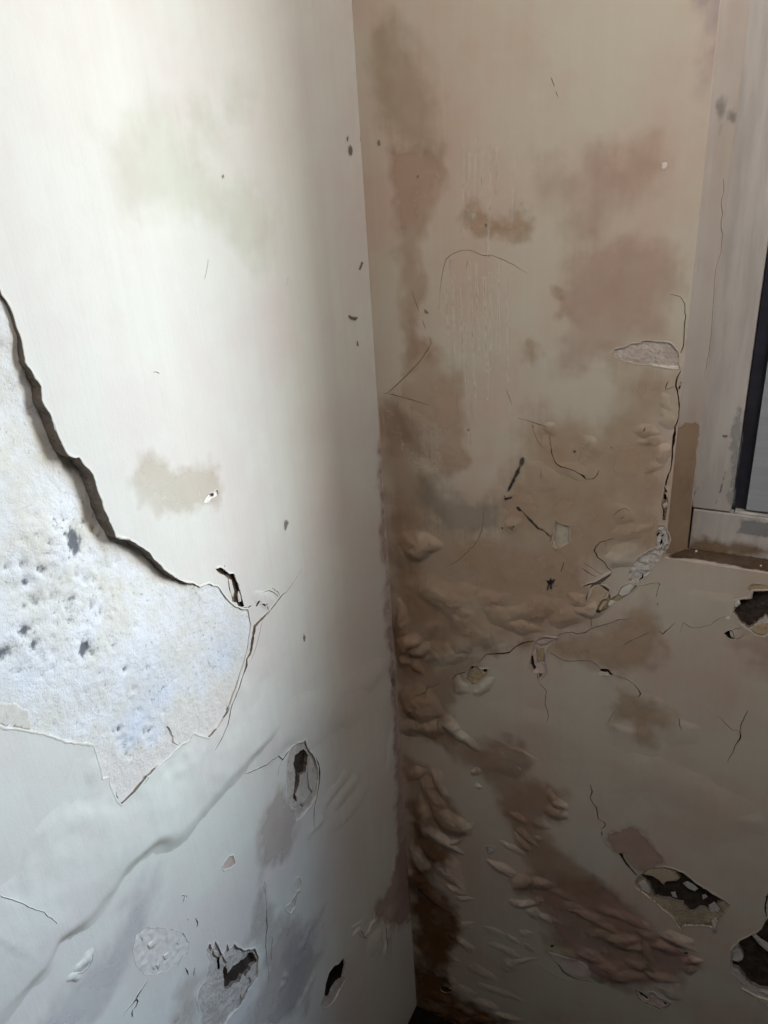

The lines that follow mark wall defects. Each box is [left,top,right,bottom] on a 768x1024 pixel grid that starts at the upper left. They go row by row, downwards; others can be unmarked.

damp [504,458,550,536]
damp [667,423,699,553]
spalling [0,285,252,807]
crack [550,508,634,577]
spalling [723,583,768,640]
crack [415,613,745,732]
crack [715,710,748,763]
spalling [285,739,319,823]
spalling [608,827,733,935]
spalling [195,940,259,1024]
damp [528,880,696,985]
spalling [729,916,768,1001]